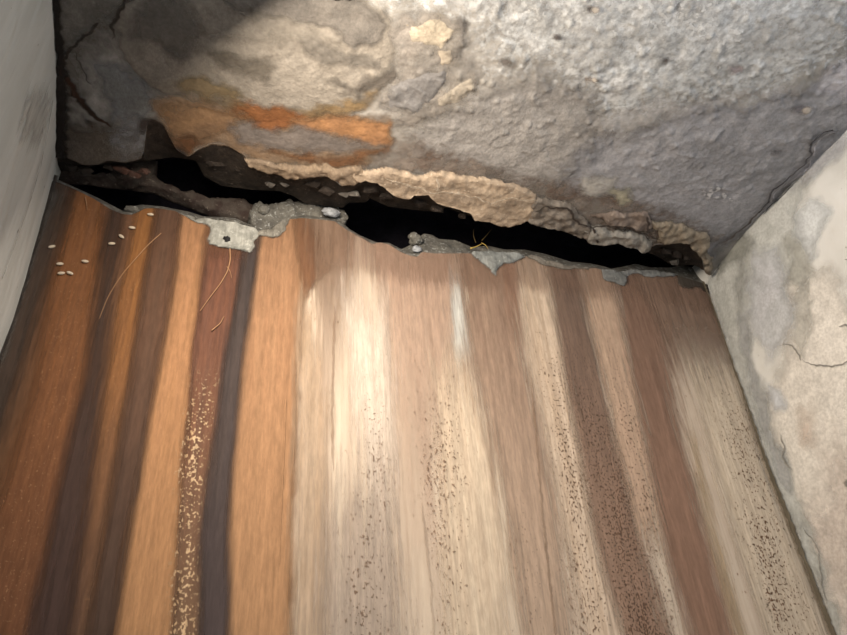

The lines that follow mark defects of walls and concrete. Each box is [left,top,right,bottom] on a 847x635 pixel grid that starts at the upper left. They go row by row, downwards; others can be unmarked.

damp [56,0,185,165]
flaking render [186,215,290,252]
rust [151,76,674,245]
flaking render [244,158,714,275]
flaking render [601,269,676,286]
crack [783,344,847,367]